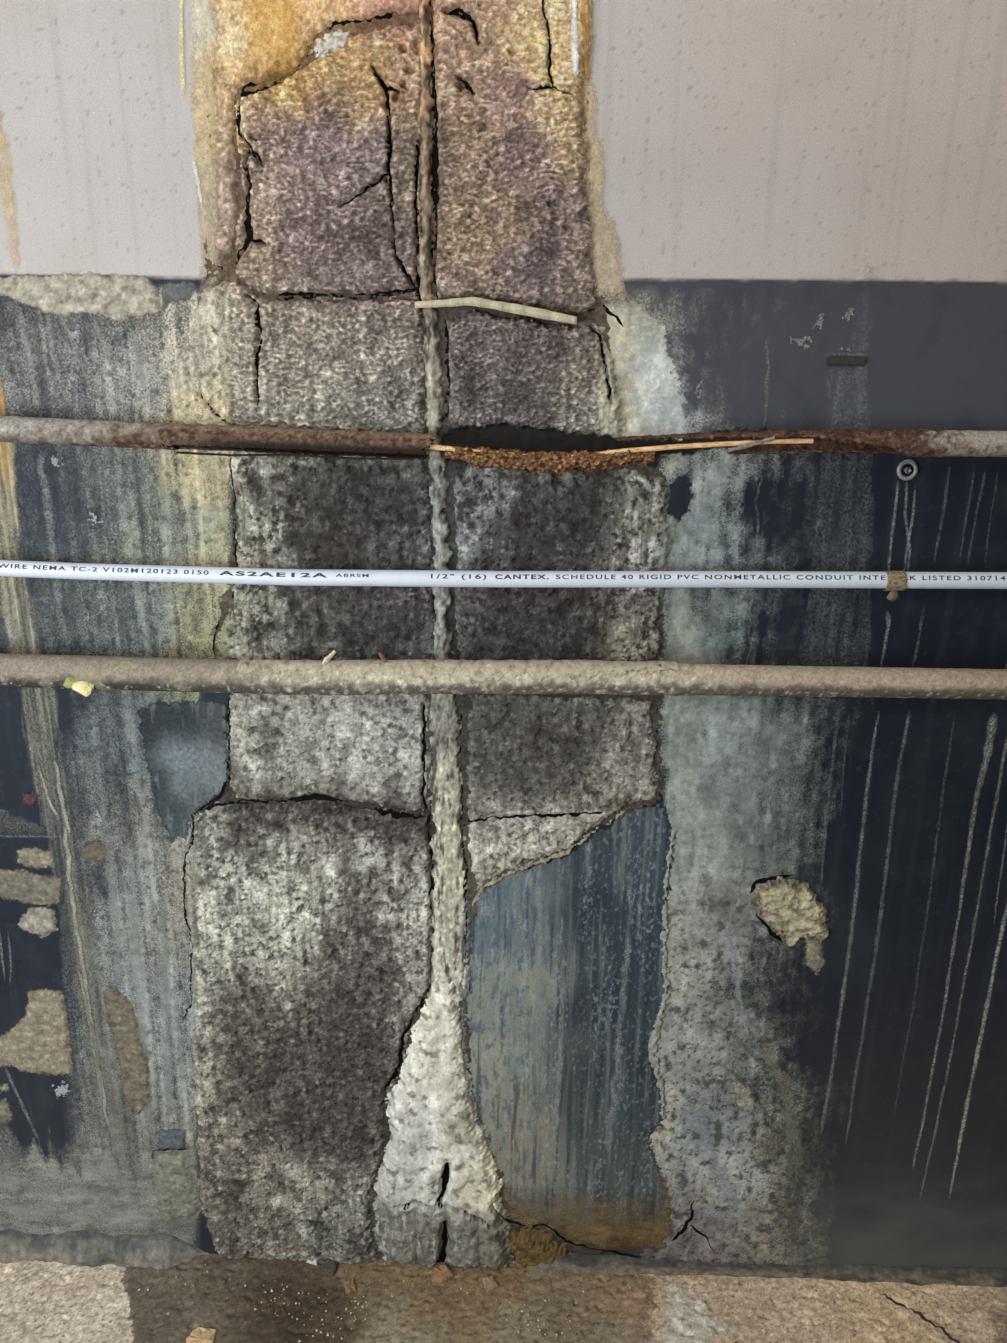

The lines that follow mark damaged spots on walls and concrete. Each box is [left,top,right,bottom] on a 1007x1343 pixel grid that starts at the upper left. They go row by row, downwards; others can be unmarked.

crack [217,55,309,269]
crack [248,0,479,423]
damp [571,0,794,571]
corrosion [0,442,19,560]
corrosion [0,576,39,654]
spalling [0,988,72,1096]
corrosion [22,688,110,1117]
damp [0,579,781,1343]
crack [182,697,603,1090]
peeling [459,803,677,1227]
damp [641,695,836,1265]
spalling [750,874,829,975]